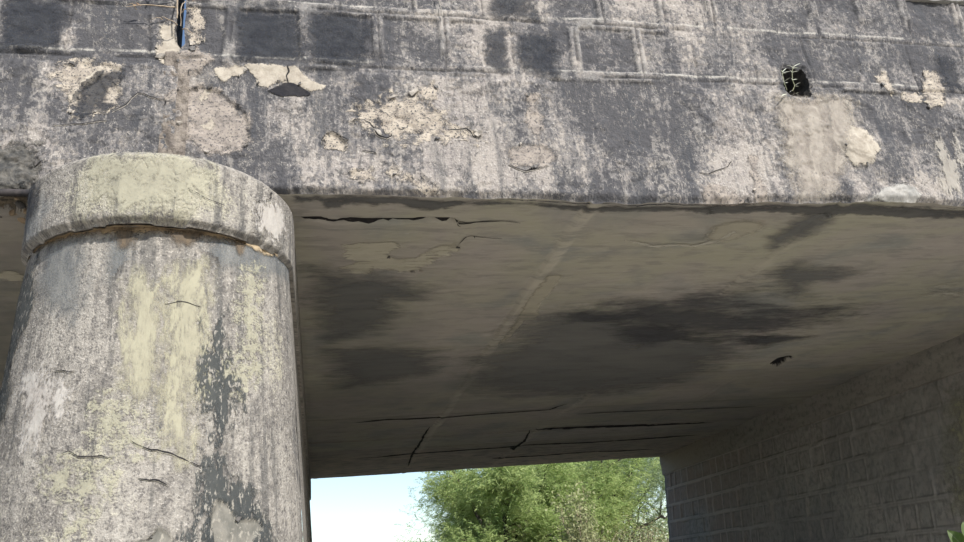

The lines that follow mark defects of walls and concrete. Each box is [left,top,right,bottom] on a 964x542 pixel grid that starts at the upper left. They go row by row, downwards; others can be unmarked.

spalling [47,6,326,159]
spalling [0,132,51,224]
crack [302,216,517,244]
water stain [773,266,853,294]
water stain [310,276,433,388]
water stain [467,309,807,397]
crack [61,451,113,459]
crack [130,440,213,467]
crack [357,404,756,466]
crack [138,478,168,487]
spalling [211,499,263,542]